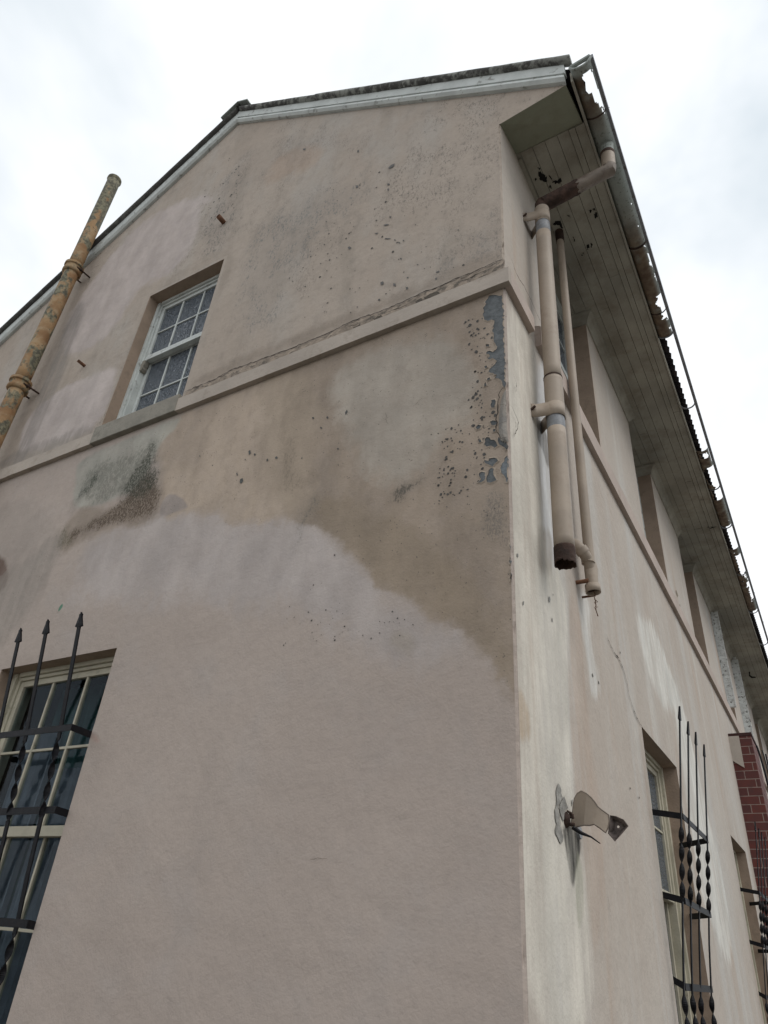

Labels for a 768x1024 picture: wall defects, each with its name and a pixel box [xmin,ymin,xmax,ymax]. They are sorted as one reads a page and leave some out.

spalling [184,258,504,396]
crack [185,259,540,392]
peeling [431,294,509,507]
leakage [0,289,532,750]